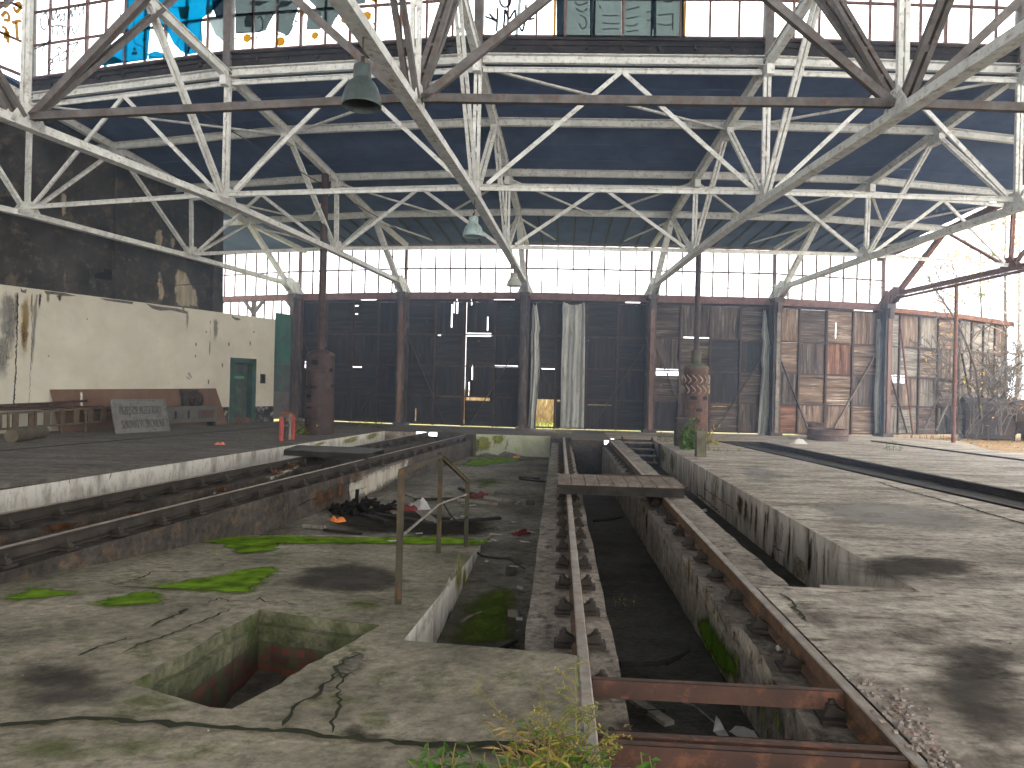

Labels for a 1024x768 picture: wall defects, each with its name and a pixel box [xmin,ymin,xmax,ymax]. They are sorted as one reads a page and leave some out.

damp [0,295,17,369]
crack [78,571,299,656]
crack [0,653,514,748]